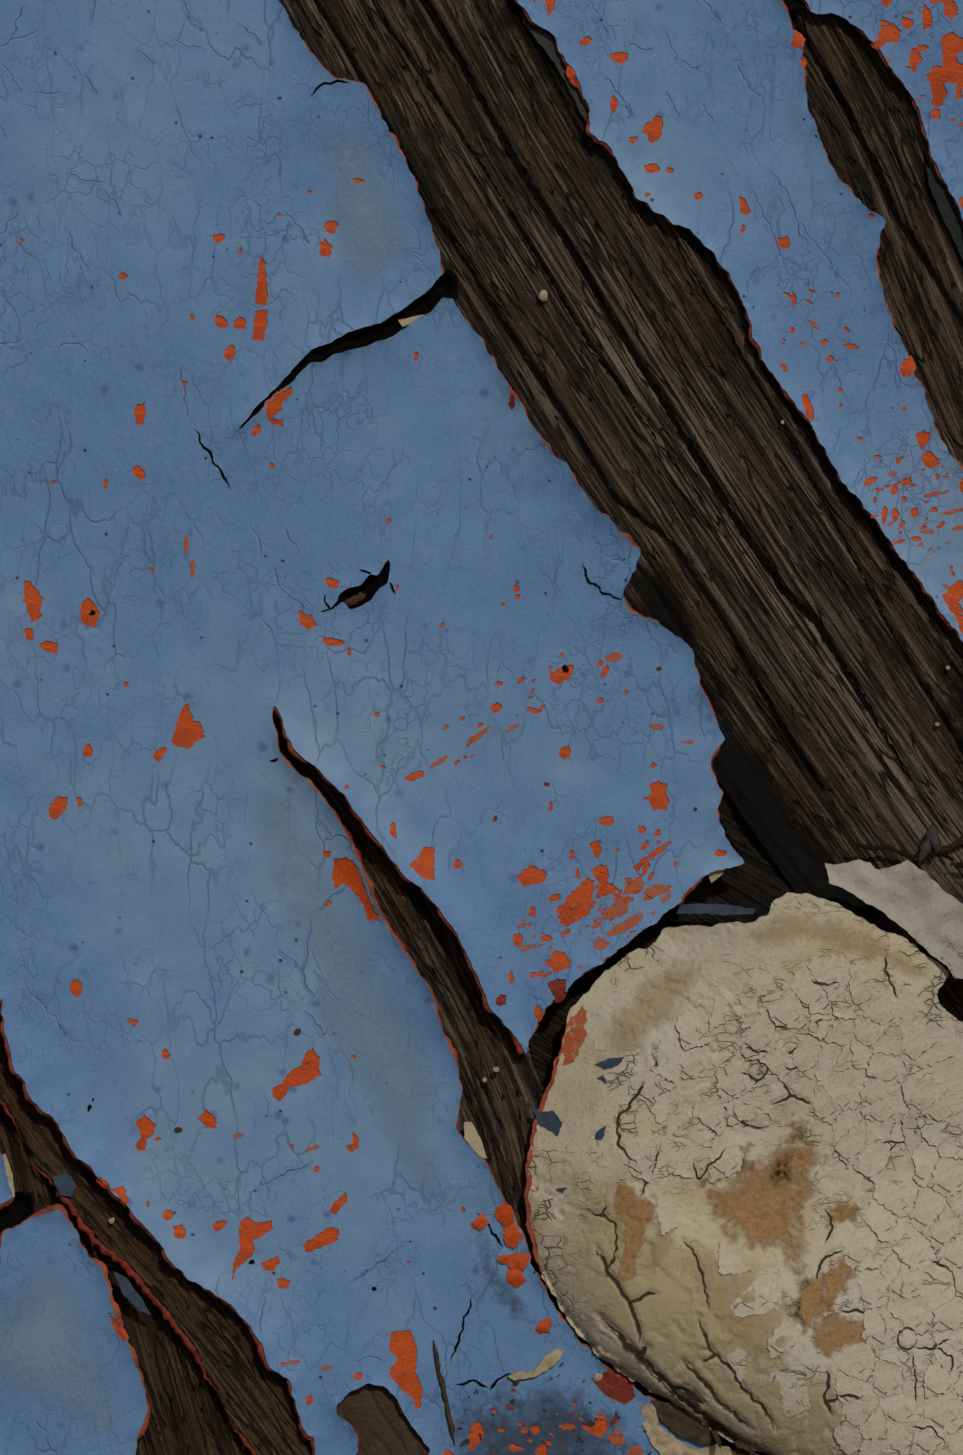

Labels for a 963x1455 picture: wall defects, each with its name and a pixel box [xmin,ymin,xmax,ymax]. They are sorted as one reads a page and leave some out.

peeling [215,256,268,361]
crack [239,0,963,836]
peeling [279,0,963,1096]
peeling [153,704,205,762]
peeling [272,1048,321,1101]
crack [693,980,838,1179]
peeling [212,1217,290,1289]
crack [582,1050,777,1455]
crack [817,1208,842,1279]
peeling [336,1254,768,1455]
crack [823,1370,864,1414]
crack [838,1286,954,1445]